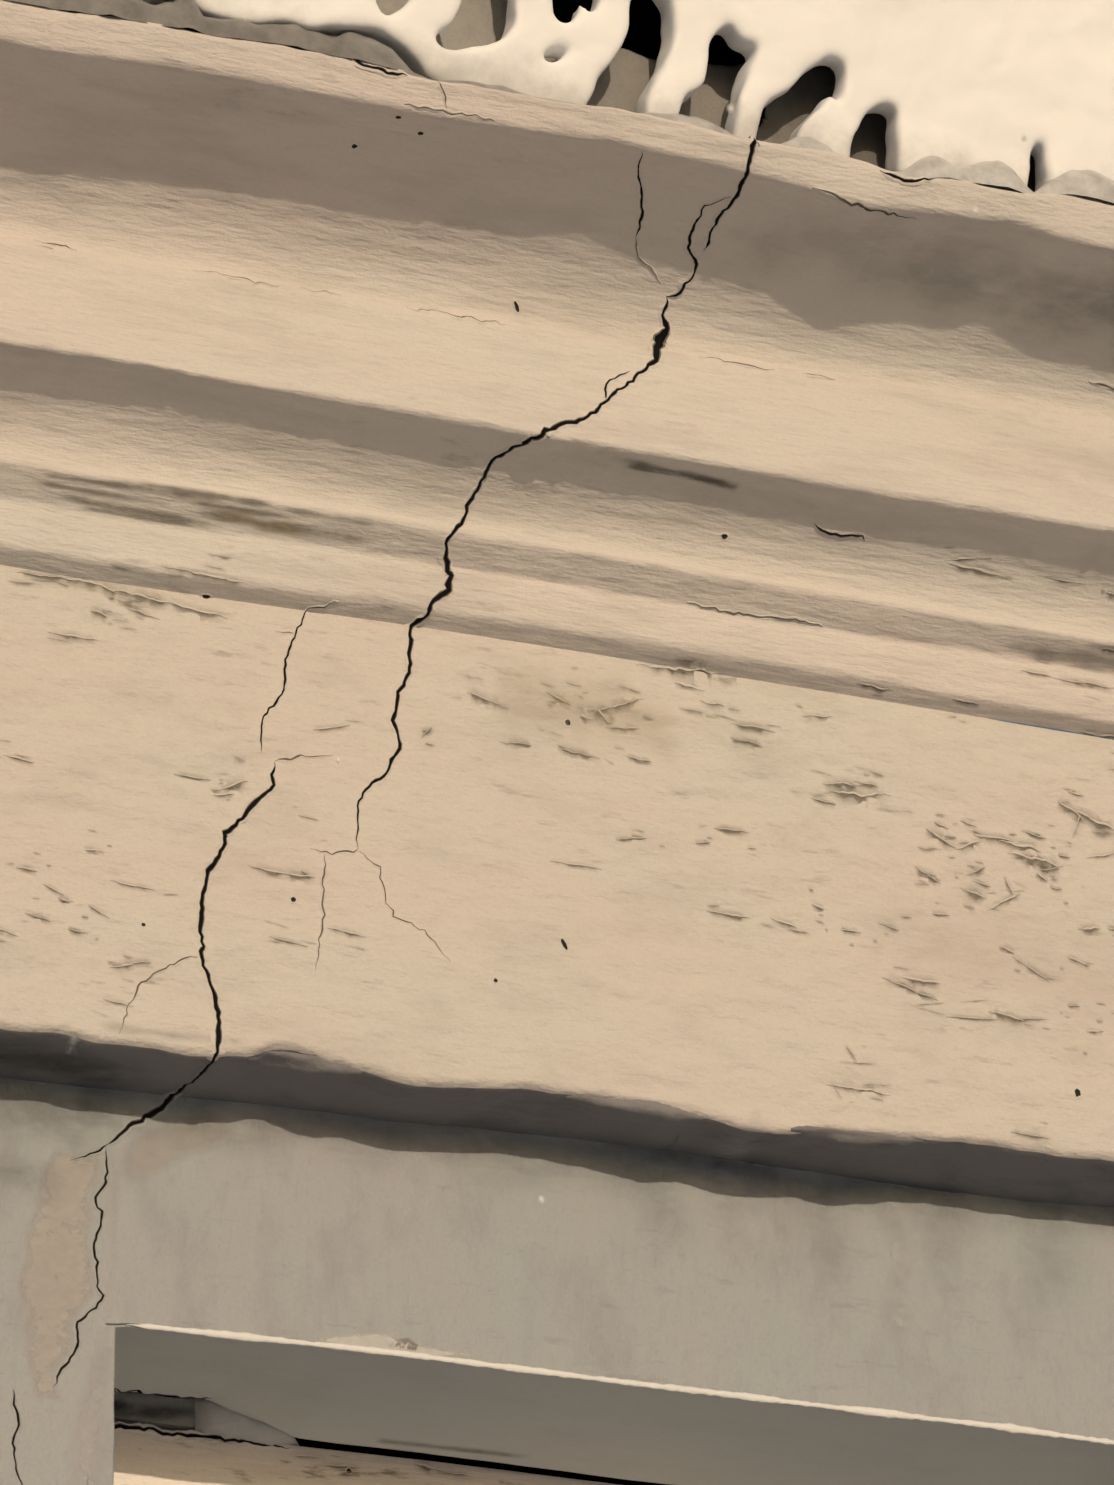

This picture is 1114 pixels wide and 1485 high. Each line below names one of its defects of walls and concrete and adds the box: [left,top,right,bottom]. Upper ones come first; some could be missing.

crack [192,269,341,297]
crack [310,107,835,970]
peeling [810,780,891,805]
peeling [1057,790,1114,837]
peeling [926,820,1114,890]
peeling [914,865,1020,911]
crack [53,600,339,1387]
peeling [882,976,941,1000]
peeling [946,1010,1048,1022]
crack [8,1389,24,1485]
crack [114,1385,291,1450]